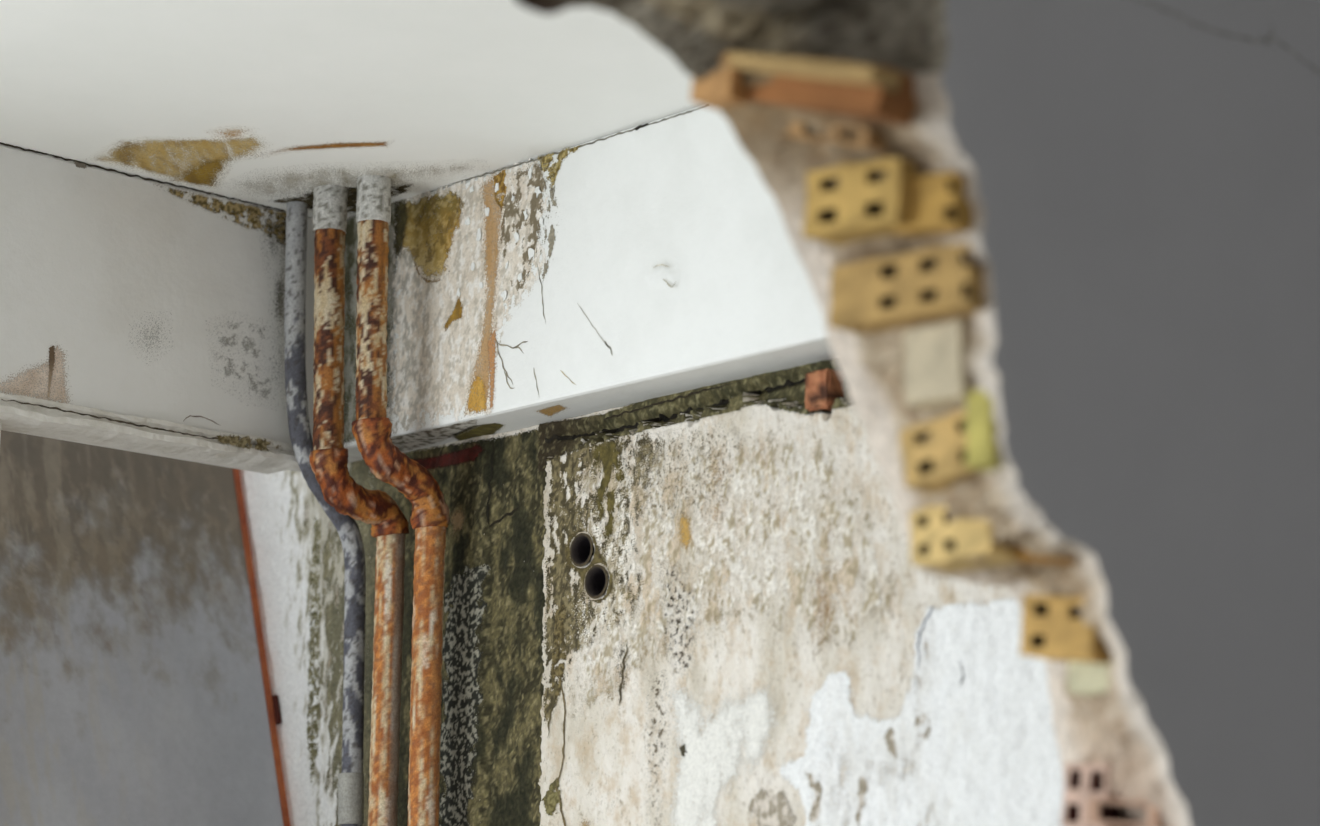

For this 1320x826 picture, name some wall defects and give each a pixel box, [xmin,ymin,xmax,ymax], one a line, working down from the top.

leakage [97,128,483,443]
rust [413,445,484,469]
peeling [386,158,550,452]
leakage [452,423,504,441]
rust [464,168,508,417]
spalling [516,0,1191,826]
peeling [439,563,490,826]
leakage [647,676,669,825]